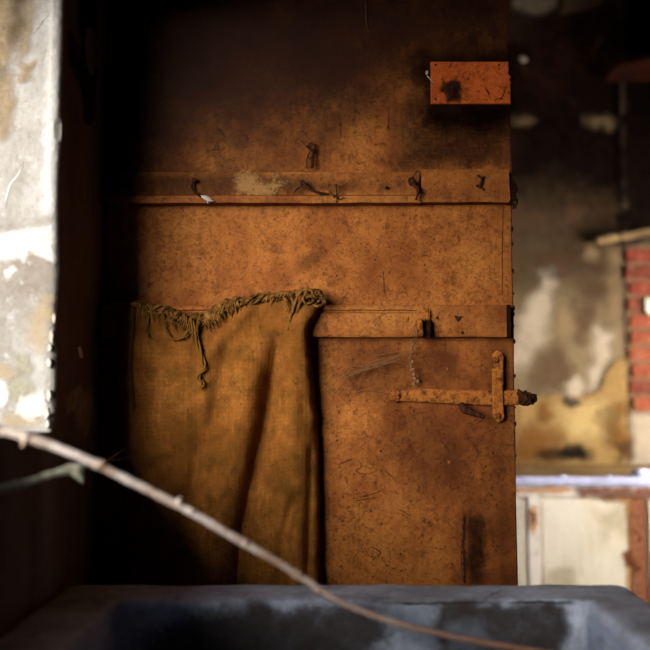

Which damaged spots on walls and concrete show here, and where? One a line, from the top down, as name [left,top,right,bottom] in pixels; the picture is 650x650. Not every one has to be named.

damp [0,0,33,136]